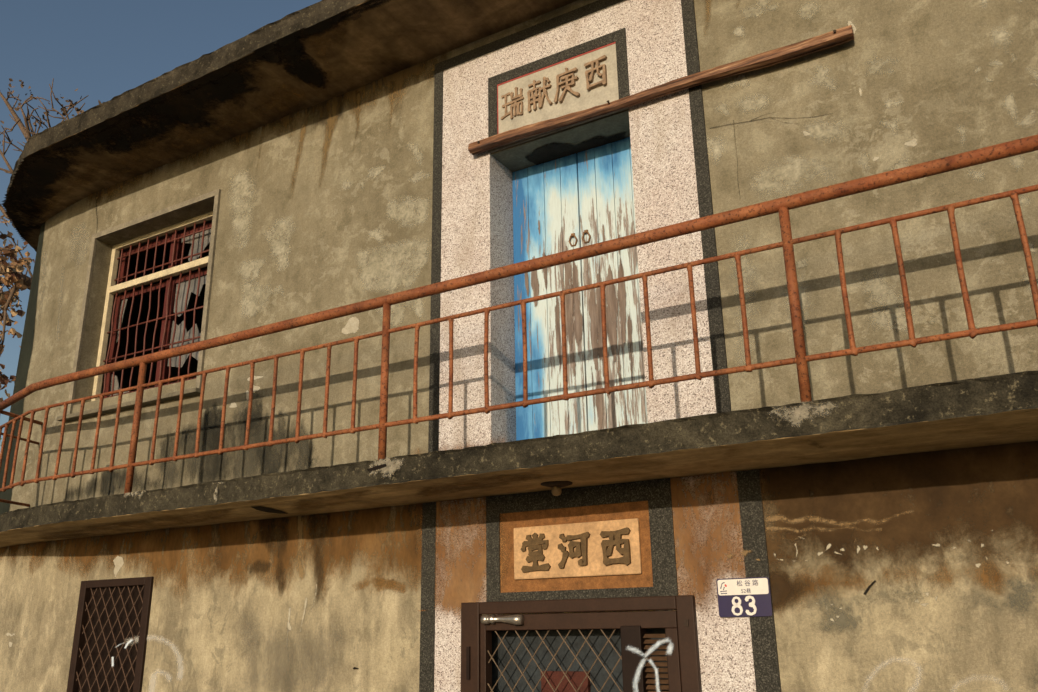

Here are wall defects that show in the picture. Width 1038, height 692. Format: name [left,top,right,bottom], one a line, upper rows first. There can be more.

water stain [0,0,443,514]
water stain [0,475,535,687]
spalling [367,457,403,476]
spalling [771,402,834,426]
water stain [663,441,1038,631]